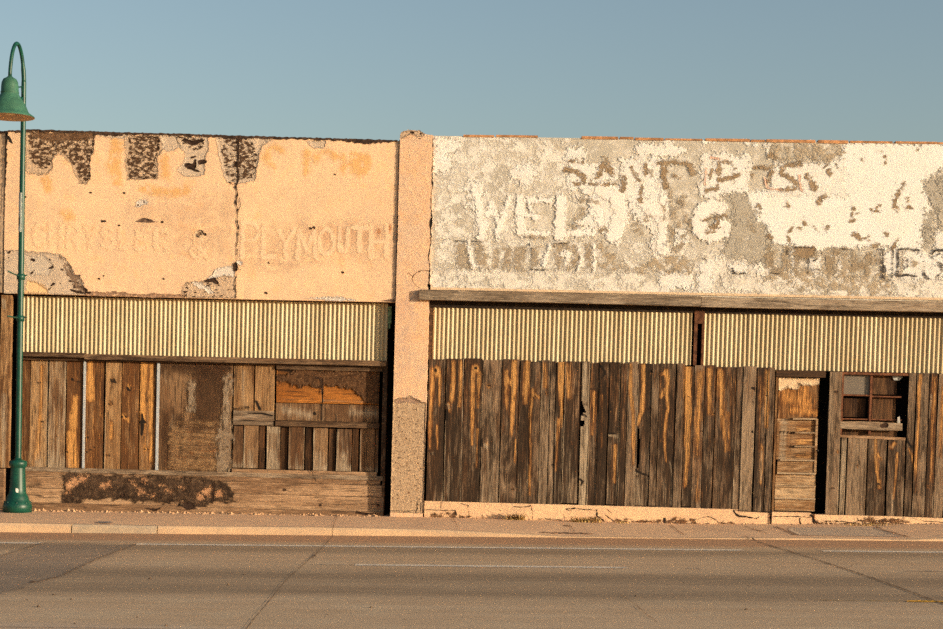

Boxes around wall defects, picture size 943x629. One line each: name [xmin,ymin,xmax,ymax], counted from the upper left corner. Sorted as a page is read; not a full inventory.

peeling [4,249,243,298]
spalling [25,131,272,193]
peeling [136,199,164,223]
crack [230,136,241,298]
peeling [400,129,943,298]
spalling [390,395,470,518]